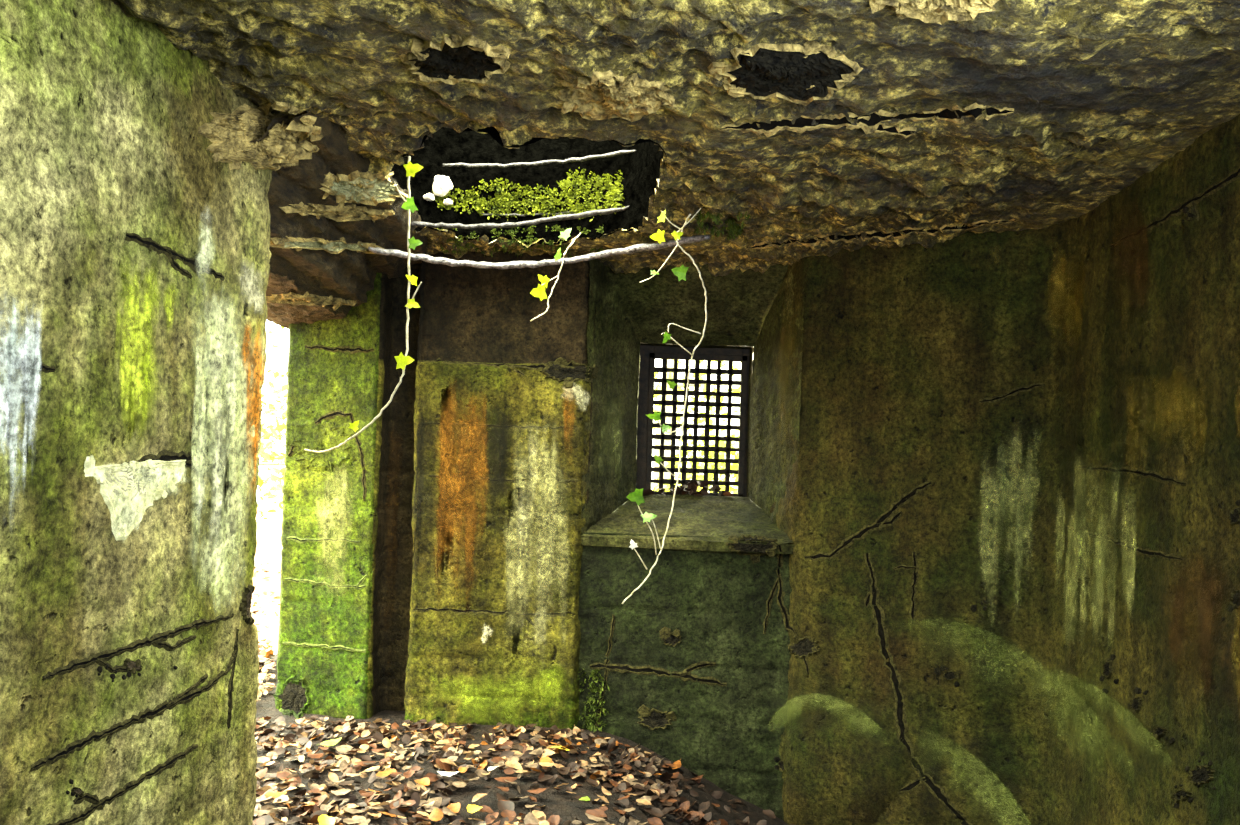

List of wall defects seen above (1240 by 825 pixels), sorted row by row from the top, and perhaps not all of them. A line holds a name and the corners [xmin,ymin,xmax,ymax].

corrosion [243,327,264,469]
peeling [84,455,186,541]
water stain [981,441,1035,579]
water stain [1056,473,1135,620]
crack [30,613,239,772]
crack [746,481,973,825]
crack [47,744,198,825]